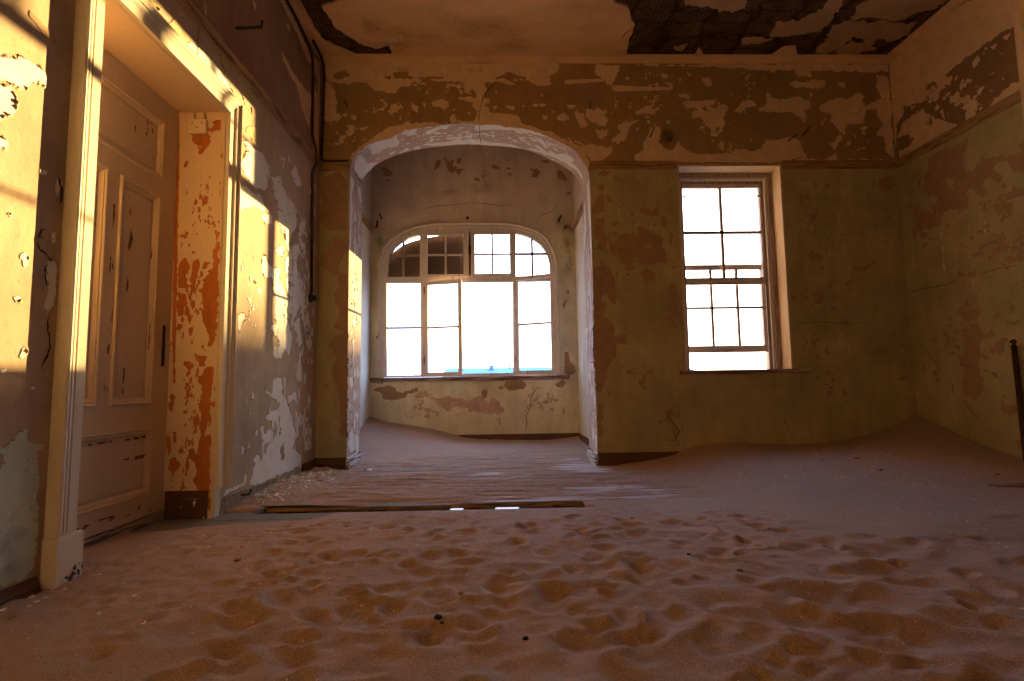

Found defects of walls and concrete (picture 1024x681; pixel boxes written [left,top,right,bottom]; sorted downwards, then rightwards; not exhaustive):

peeling [0,135,8,152]
peeling [0,53,47,120]
peeling [166,0,1020,518]
peeling [0,426,44,587]